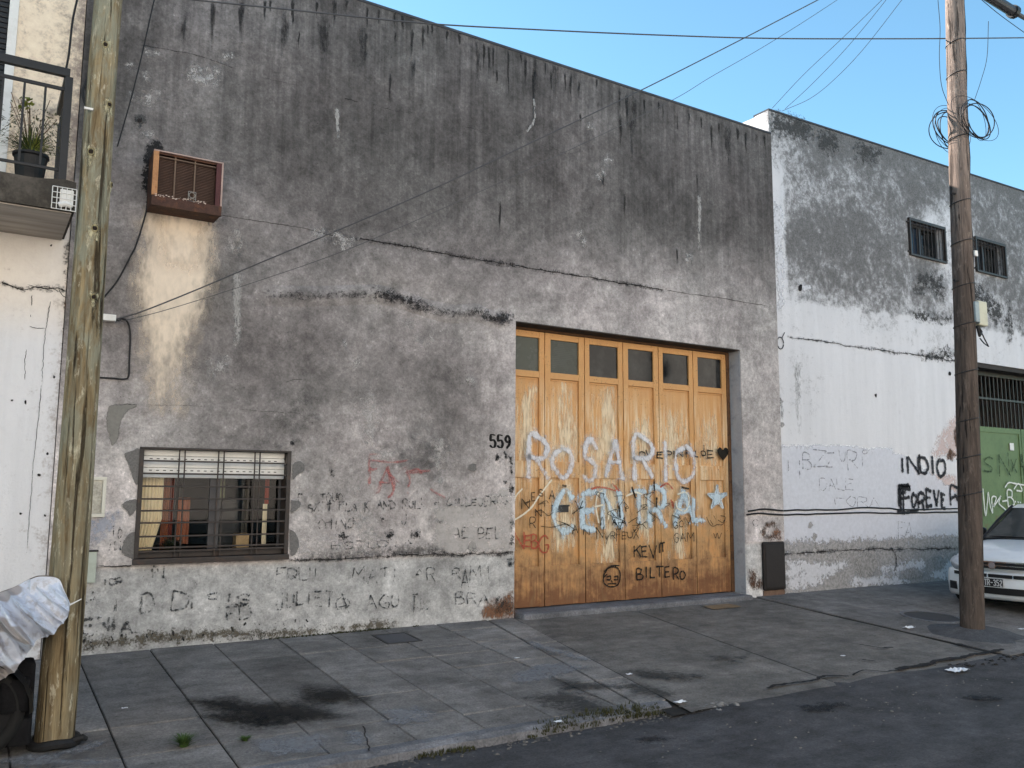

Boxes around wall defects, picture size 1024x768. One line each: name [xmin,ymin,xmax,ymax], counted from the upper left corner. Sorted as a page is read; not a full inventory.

water stain [281,0,300,46]
water stain [476,44,580,132]
water stain [677,109,839,157]
water stain [137,212,211,398]
crack [221,215,765,306]
water stain [913,273,946,302]
water stain [913,308,952,325]
water stain [975,283,1013,342]
crack [787,336,954,361]
crack [2,281,65,545]
flaking render [784,522,958,593]
rust [482,592,515,619]